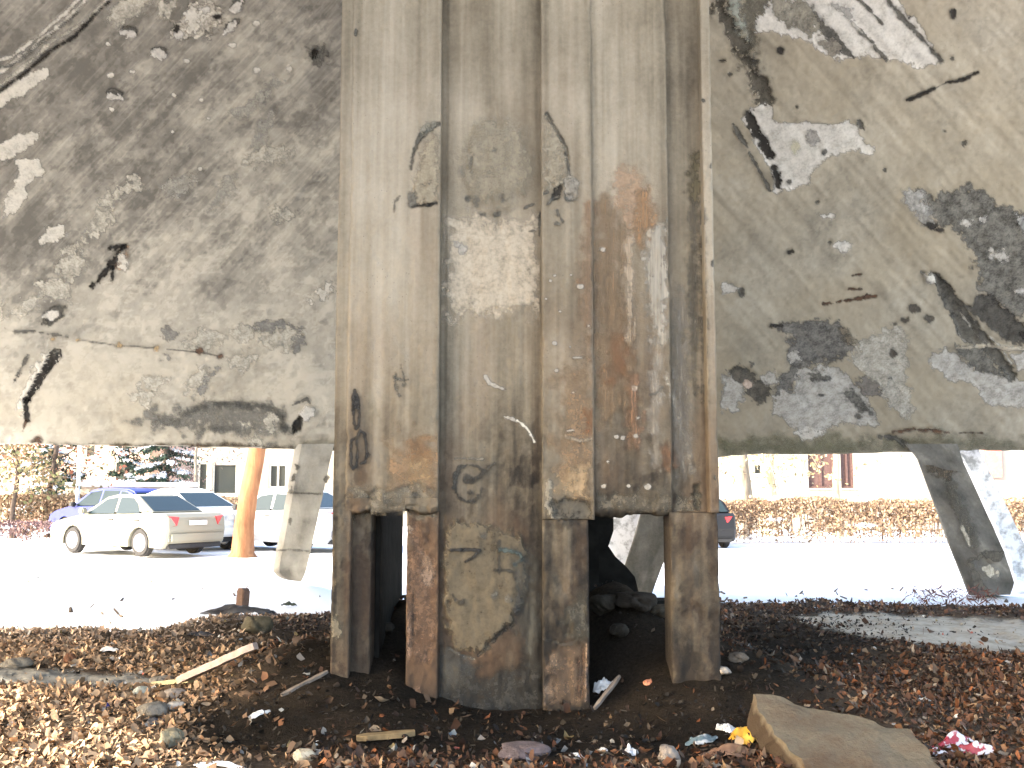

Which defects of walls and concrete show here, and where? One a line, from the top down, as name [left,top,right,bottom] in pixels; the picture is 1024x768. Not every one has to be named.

peeling [754,0,954,69]
peeling [0,131,46,216]
spalling [393,121,441,210]
peeling [732,103,875,194]
peeling [441,211,540,325]
spalling [14,348,62,429]
crack [13,330,223,359]
leakage [161,402,288,433]
rust [550,164,657,500]
peeling [720,317,916,440]
spalling [920,271,1024,409]